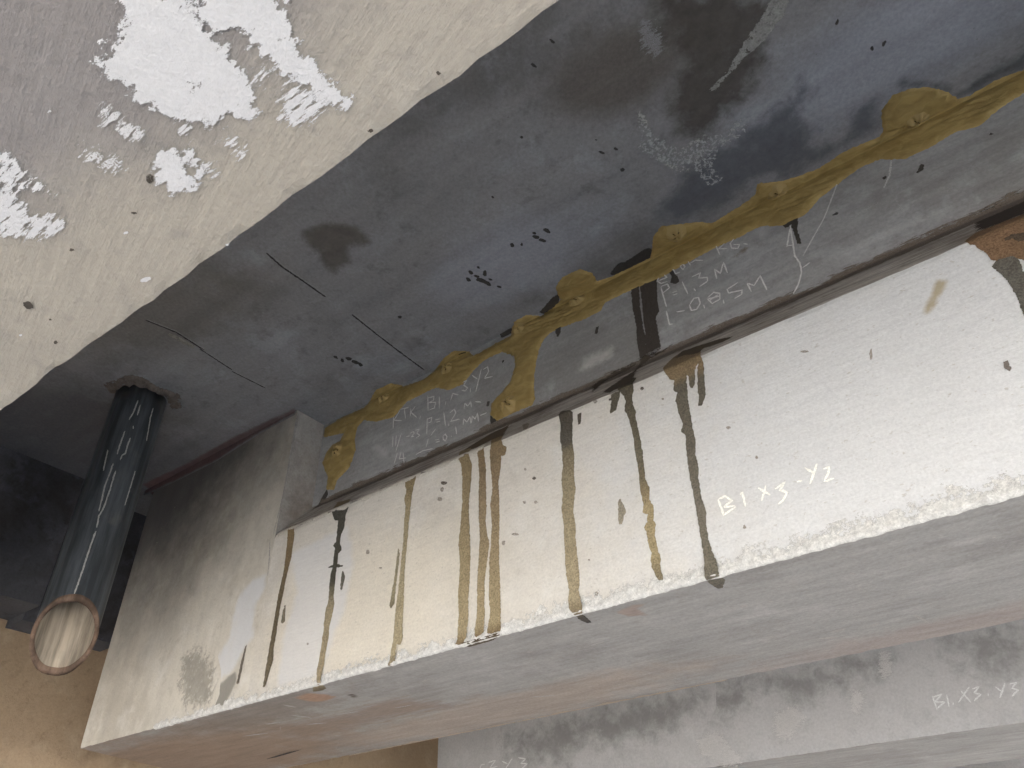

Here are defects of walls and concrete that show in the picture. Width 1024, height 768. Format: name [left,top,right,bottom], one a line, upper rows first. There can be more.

peeling [88,0,355,197]
water stain [632,0,1024,226]
peeling [78,141,130,174]
peeling [0,150,68,242]
crack [266,253,326,297]
water stain [296,218,376,279]
water stain [611,248,652,275]
corrosion [965,193,1024,314]
crack [146,320,267,388]
crack [352,314,425,370]
water stain [603,279,663,580]